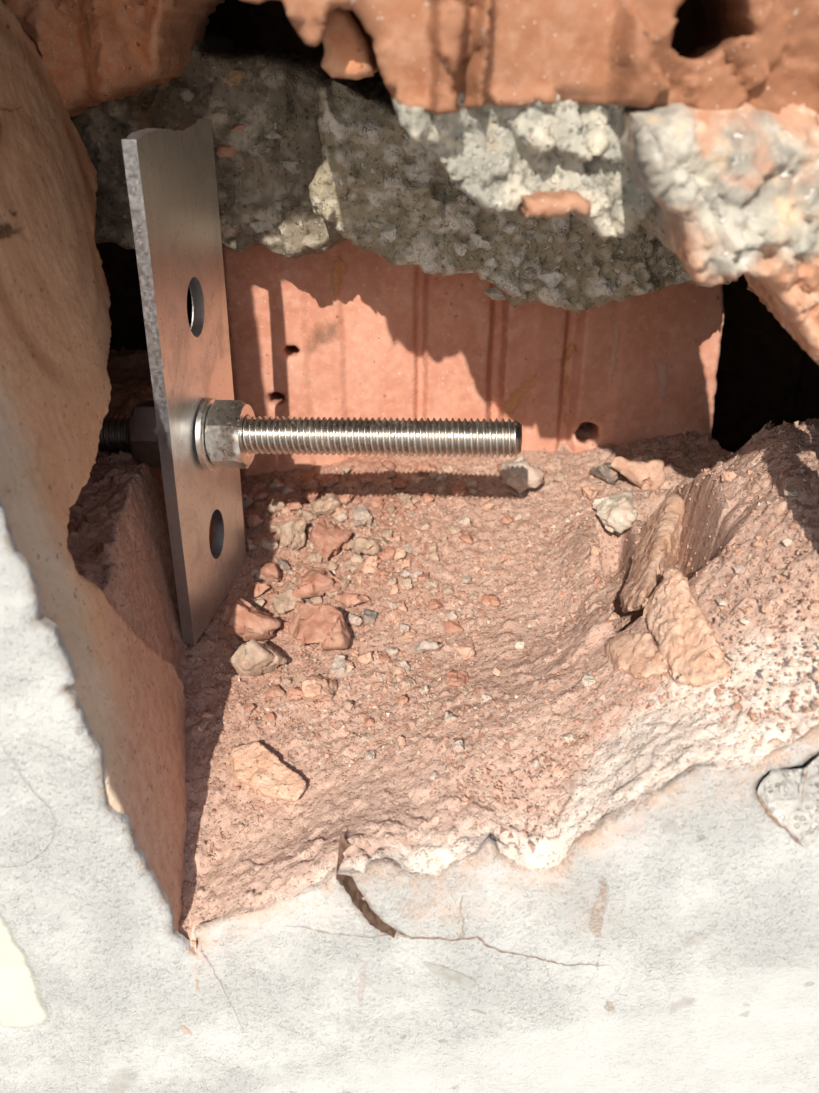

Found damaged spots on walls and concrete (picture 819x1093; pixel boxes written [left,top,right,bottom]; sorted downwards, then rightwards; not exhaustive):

spalling [757,753,819,845]
crack [288,832,610,978]